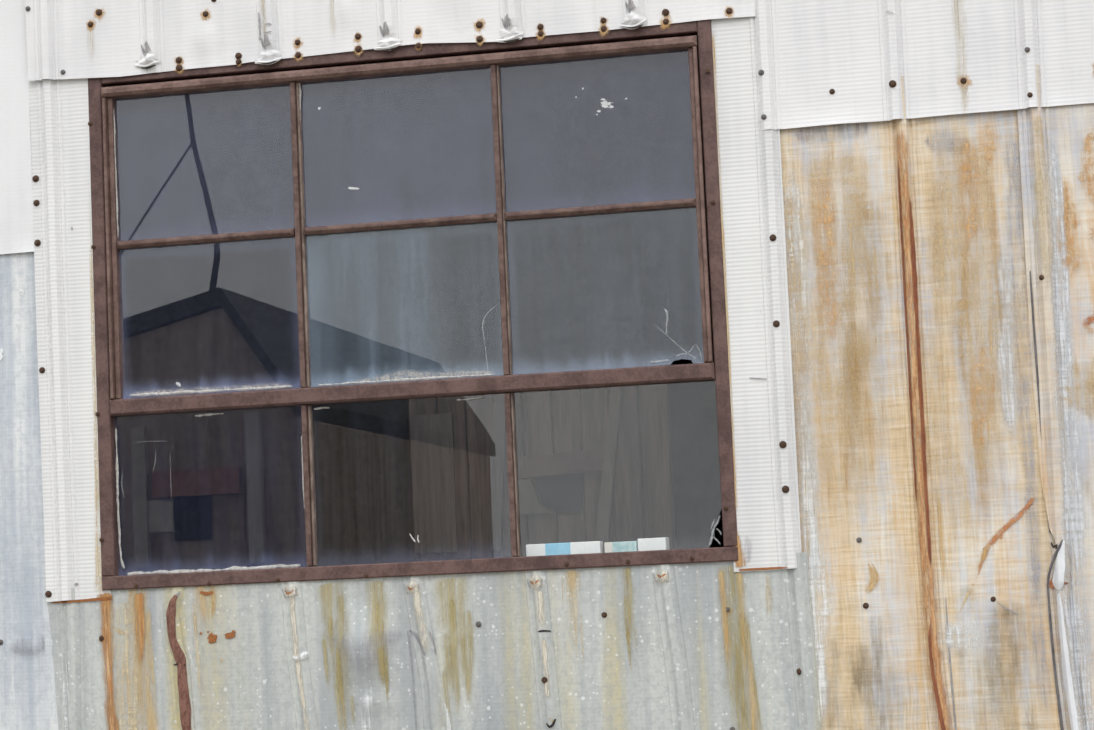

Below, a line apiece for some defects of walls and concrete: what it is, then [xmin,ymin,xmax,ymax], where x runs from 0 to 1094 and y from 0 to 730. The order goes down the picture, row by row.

rust [721,205,731,379]
rust [811,157,879,489]
rust [933,130,1002,468]
rust [979,498,1034,572]
rust [52,521,156,730]
rust [166,591,236,730]
rust [323,583,354,727]
rust [372,582,388,693]